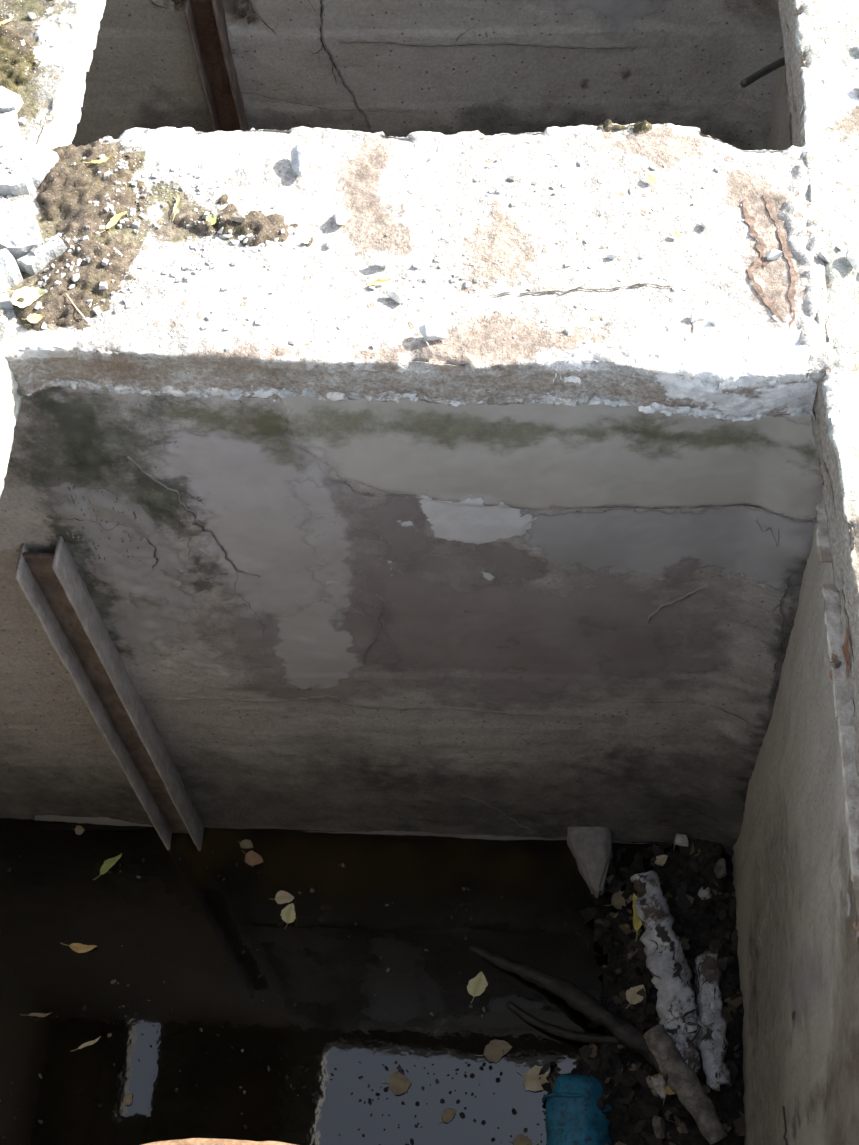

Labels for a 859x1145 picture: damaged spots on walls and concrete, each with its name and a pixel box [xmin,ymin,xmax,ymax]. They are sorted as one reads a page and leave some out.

flaking render [222,0,258,25]
crack [241,0,637,129]
crack [486,283,695,296]
crack [823,315,831,343]
water stain [534,314,859,451]
crack [59,518,159,570]
crack [126,456,265,637]